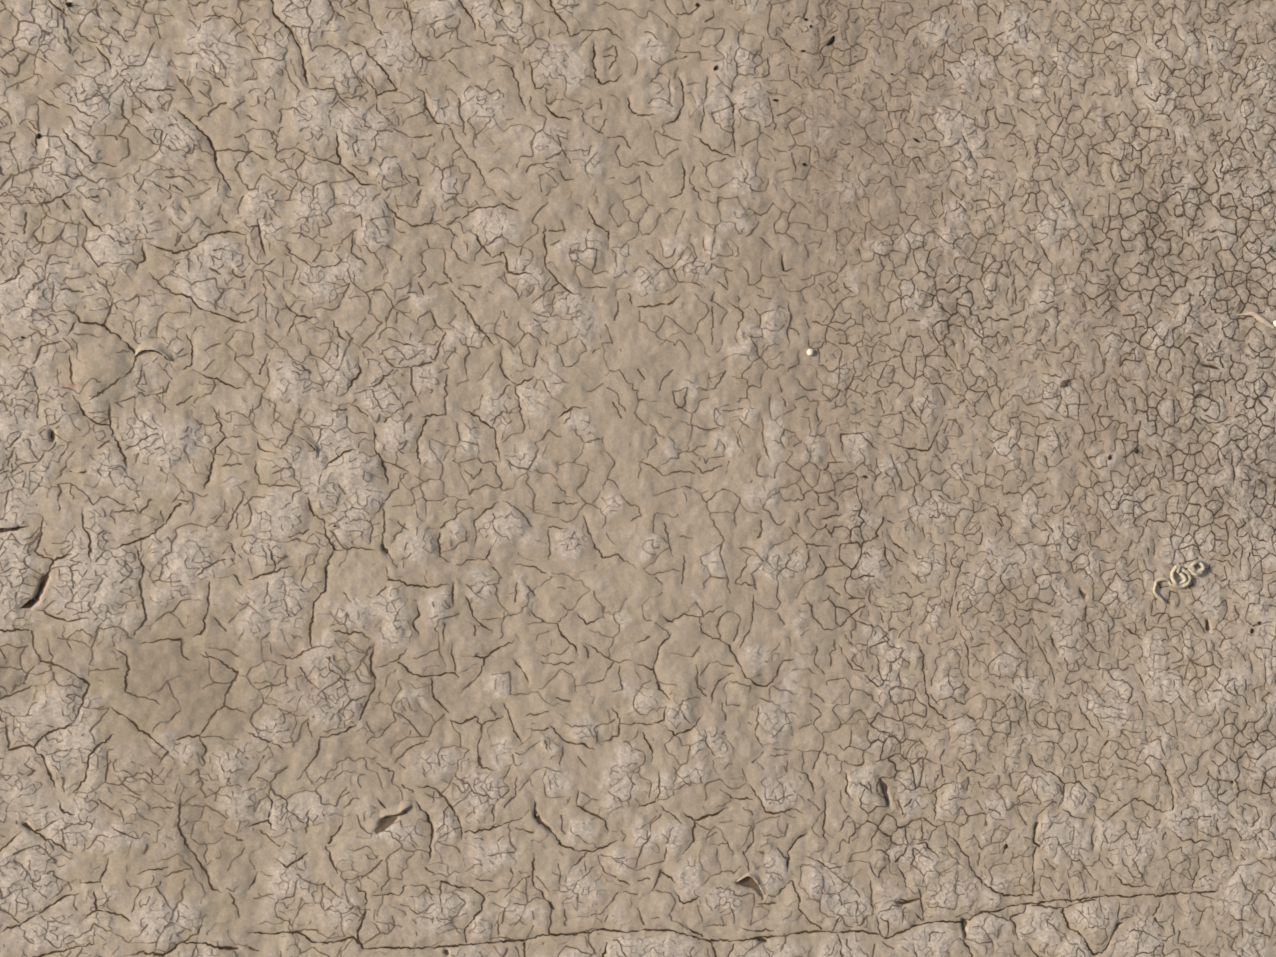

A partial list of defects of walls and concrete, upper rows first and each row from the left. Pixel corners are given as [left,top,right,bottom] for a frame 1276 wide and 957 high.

crack [534,0,622,44]
crack [229,87,286,118]
crack [615,144,653,182]
crack [568,228,608,288]
crack [607,175,676,278]
crack [633,211,745,297]
crack [614,285,728,360]
crack [587,383,625,418]
crack [642,512,685,585]
crack [654,486,758,593]
crack [139,638,189,660]
crack [367,568,459,666]